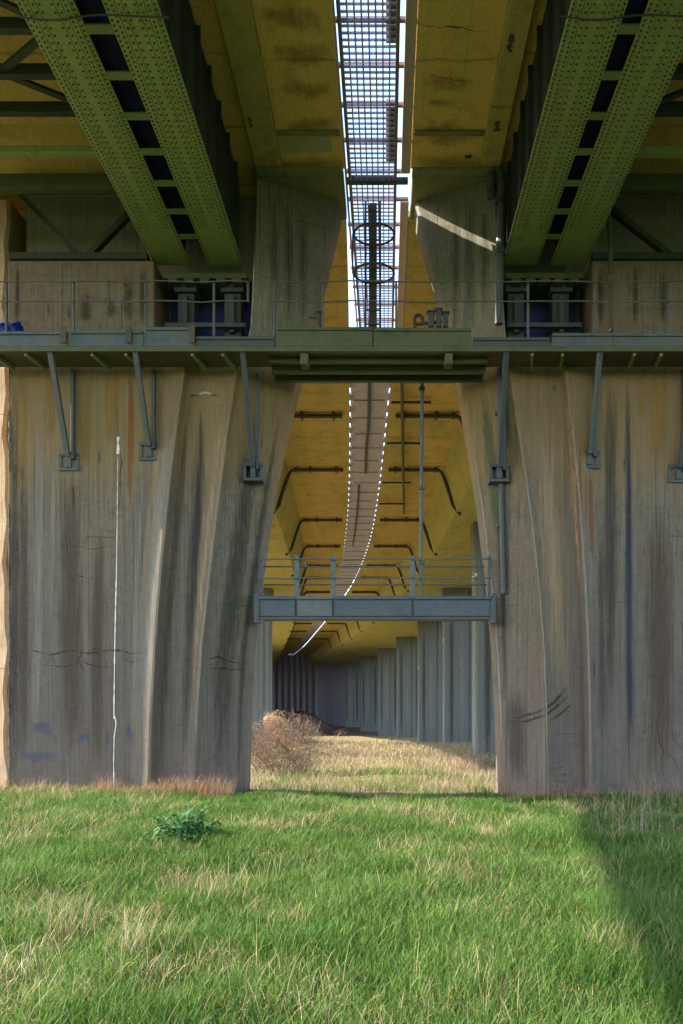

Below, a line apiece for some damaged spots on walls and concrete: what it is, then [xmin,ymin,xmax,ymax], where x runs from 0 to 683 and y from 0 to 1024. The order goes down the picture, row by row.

crack [19,412,146,784]
water stain [185,415,229,722]
water stain [215,474,267,724]
water stain [485,382,632,768]